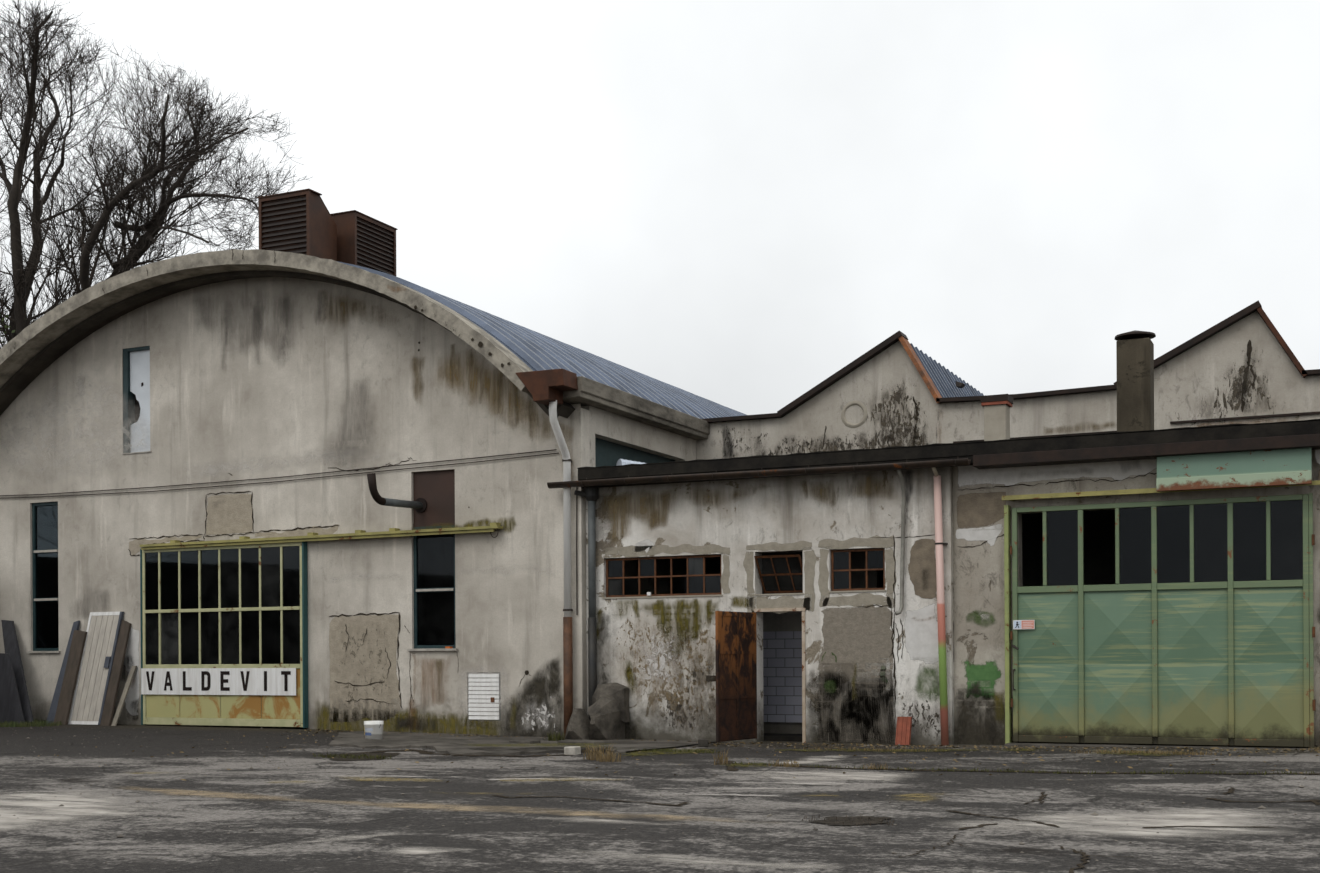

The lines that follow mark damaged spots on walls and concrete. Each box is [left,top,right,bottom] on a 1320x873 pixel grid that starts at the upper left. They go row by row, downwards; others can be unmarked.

water stain [445,345,547,431]
flaking render [128,491,339,556]
water stain [657,599,711,636]
flaking render [329,612,402,722]
water stain [503,661,562,737]
water stain [625,719,641,739]
water stain [808,673,896,744]